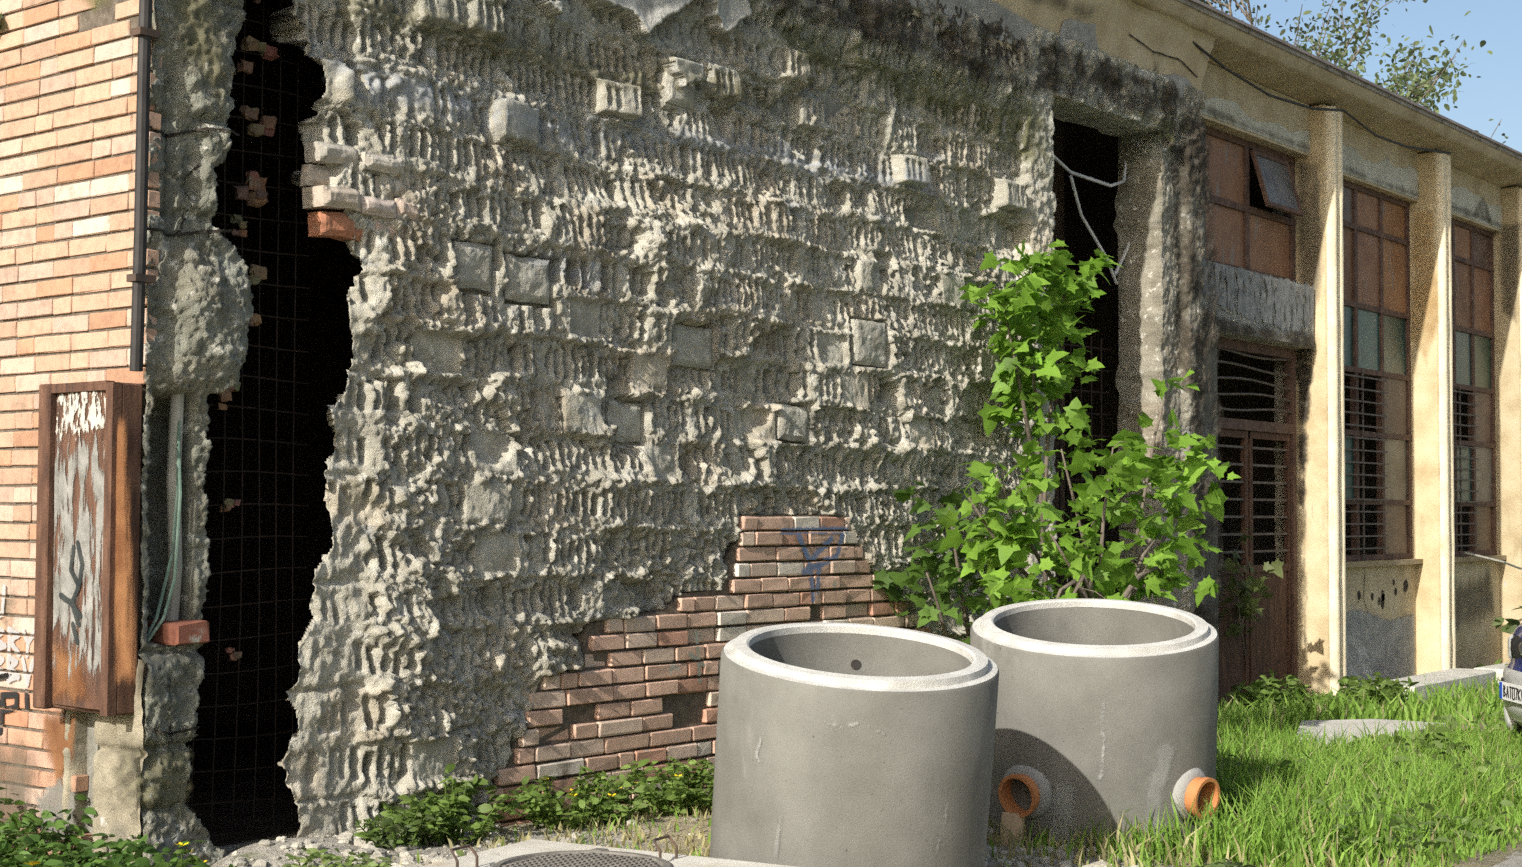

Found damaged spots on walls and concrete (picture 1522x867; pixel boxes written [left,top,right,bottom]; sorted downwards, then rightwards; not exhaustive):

water stain [773,0,1234,167]
peeling [52,390,106,679]
corrosion [114,422,132,679]
spalling [62,0,261,867]
spalling [269,0,1314,838]